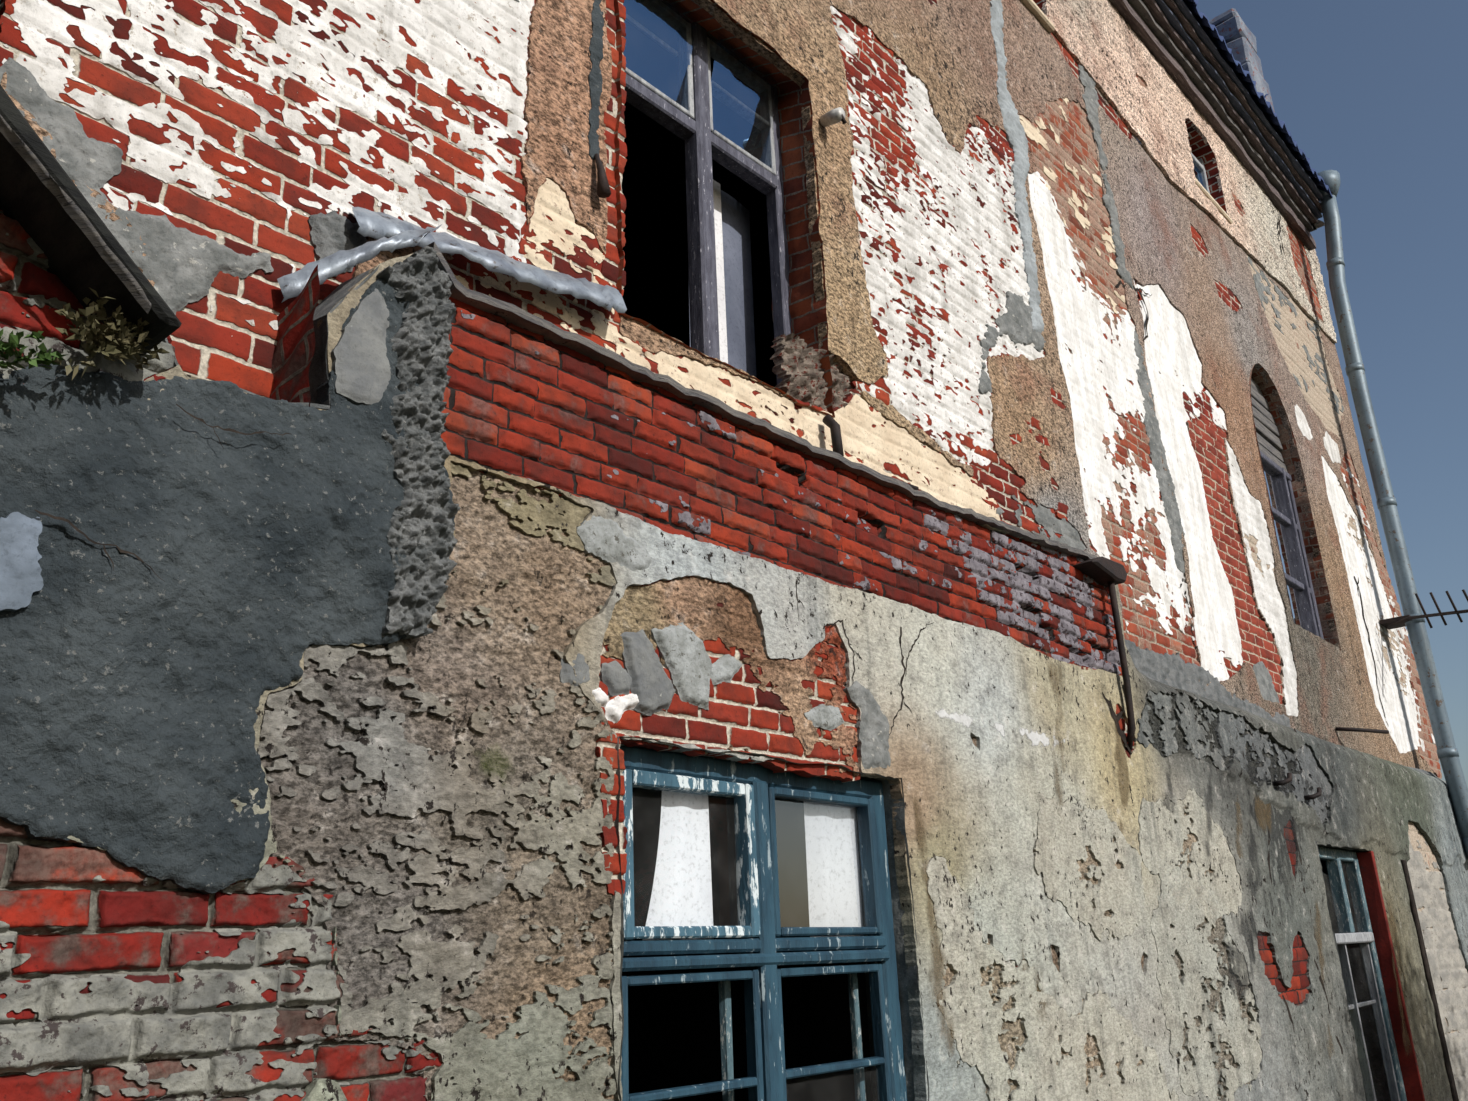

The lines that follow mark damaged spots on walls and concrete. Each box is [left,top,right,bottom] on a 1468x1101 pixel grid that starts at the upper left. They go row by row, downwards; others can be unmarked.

peeling [0,0,627,398]
flaking render [0,297,1122,1101]
peeling [446,5,1299,717]
crack [889,622,934,735]
flaking render [925,788,1309,1101]
peeling [1247,224,1442,779]